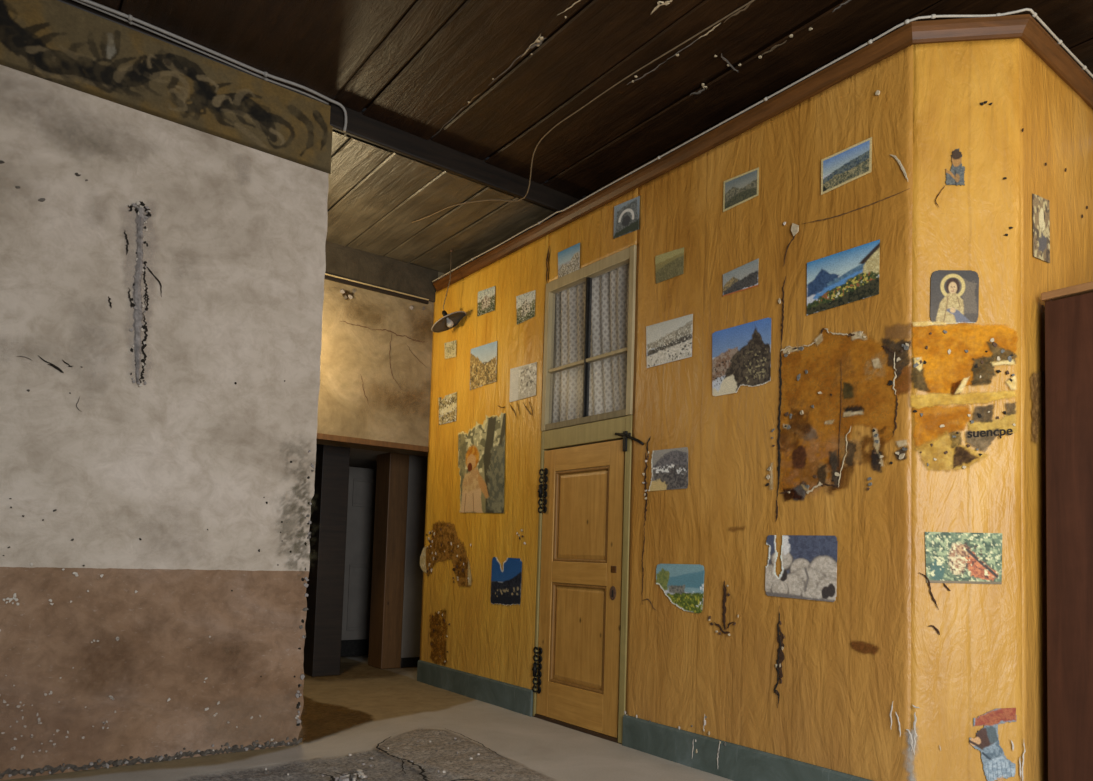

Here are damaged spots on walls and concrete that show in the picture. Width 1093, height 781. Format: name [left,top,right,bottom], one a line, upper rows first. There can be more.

crack [774,606,785,708]